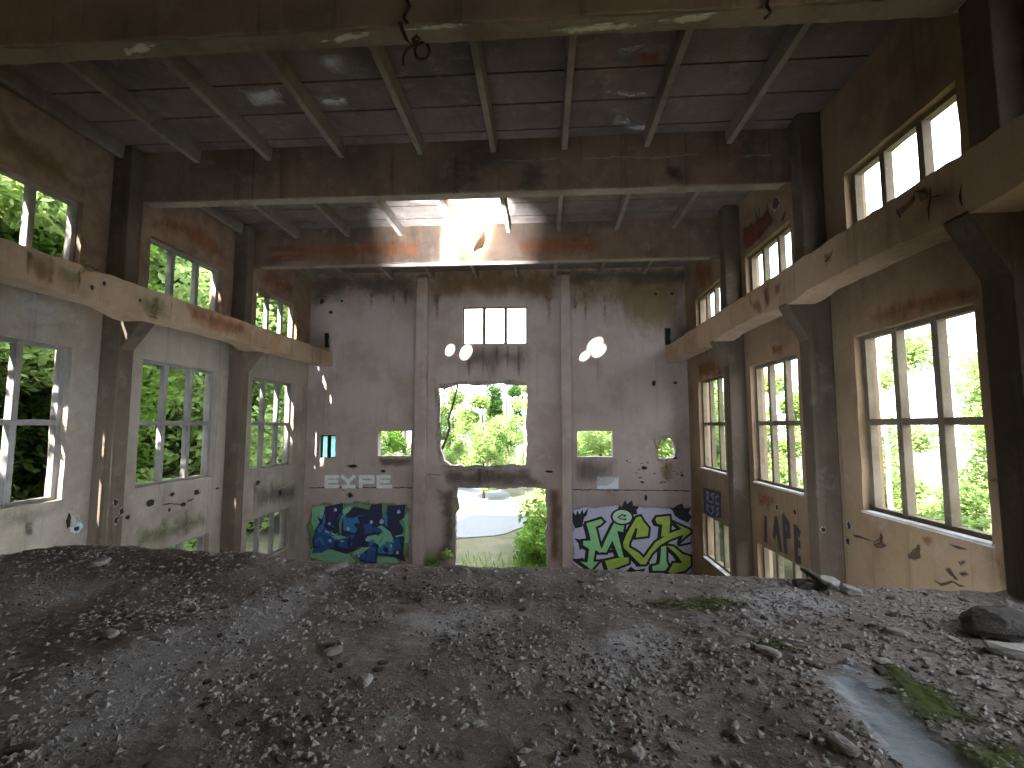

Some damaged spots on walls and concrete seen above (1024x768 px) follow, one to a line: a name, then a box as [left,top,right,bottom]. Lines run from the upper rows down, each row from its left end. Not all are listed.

leakage [315,276,411,299]
leakage [434,274,553,299]
leakage [573,272,685,323]
spalling [433,379,527,471]
spalling [144,489,201,513]